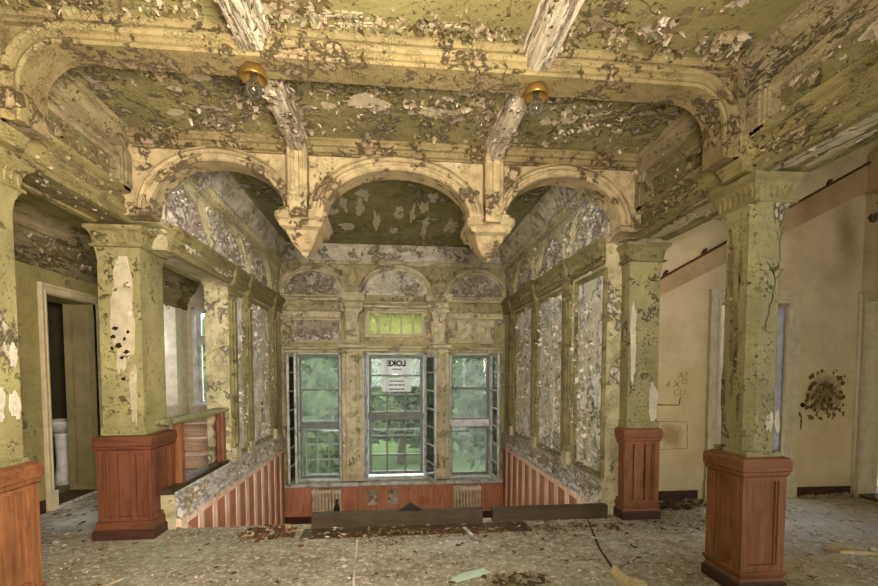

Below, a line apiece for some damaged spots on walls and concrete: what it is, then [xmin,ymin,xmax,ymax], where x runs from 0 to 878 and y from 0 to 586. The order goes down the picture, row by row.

peeling [858,19,878,43]
peeling [160,82,192,116]
peeling [302,83,391,115]
peeling [400,105,447,121]
peeling [539,102,623,136]
peeling [771,112,878,171]
peeling [10,342,18,367]
peeling [110,256,137,424]
peeling [721,229,743,422]
peeling [0,387,21,422]
peeling [649,382,659,421]
peeling [765,408,780,433]